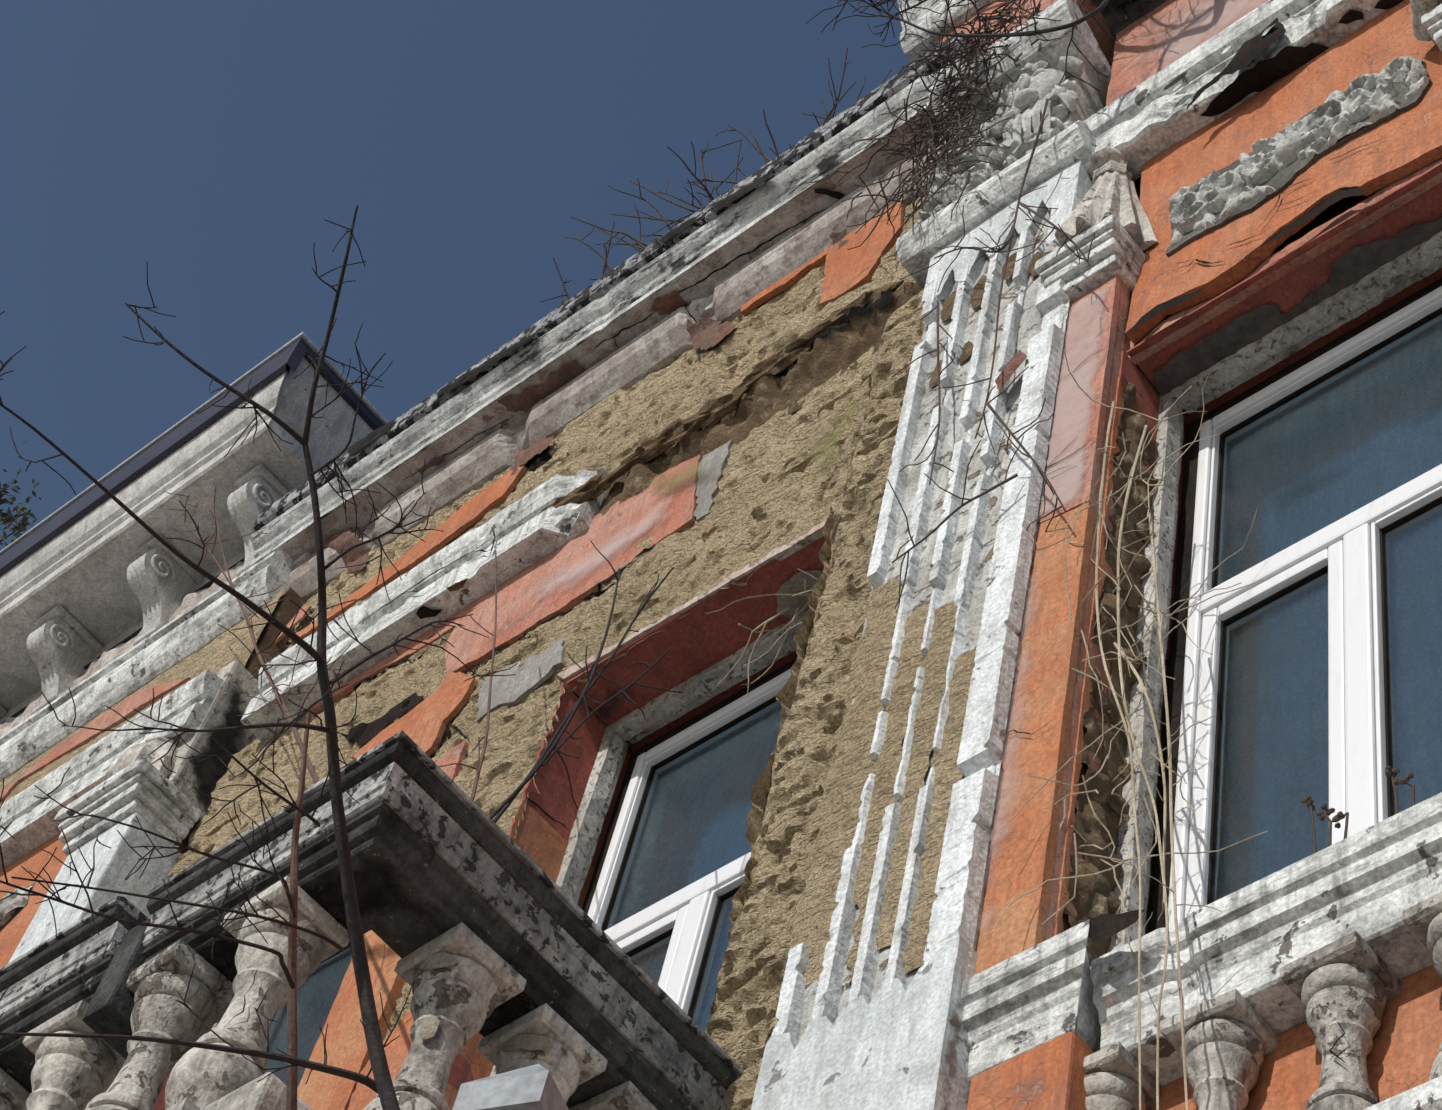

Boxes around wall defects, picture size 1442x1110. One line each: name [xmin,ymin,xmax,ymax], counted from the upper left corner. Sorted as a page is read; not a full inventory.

spalling [1164,17,1329,117]
spalling [167,194,1043,1110]
spalling [1063,377,1159,966]